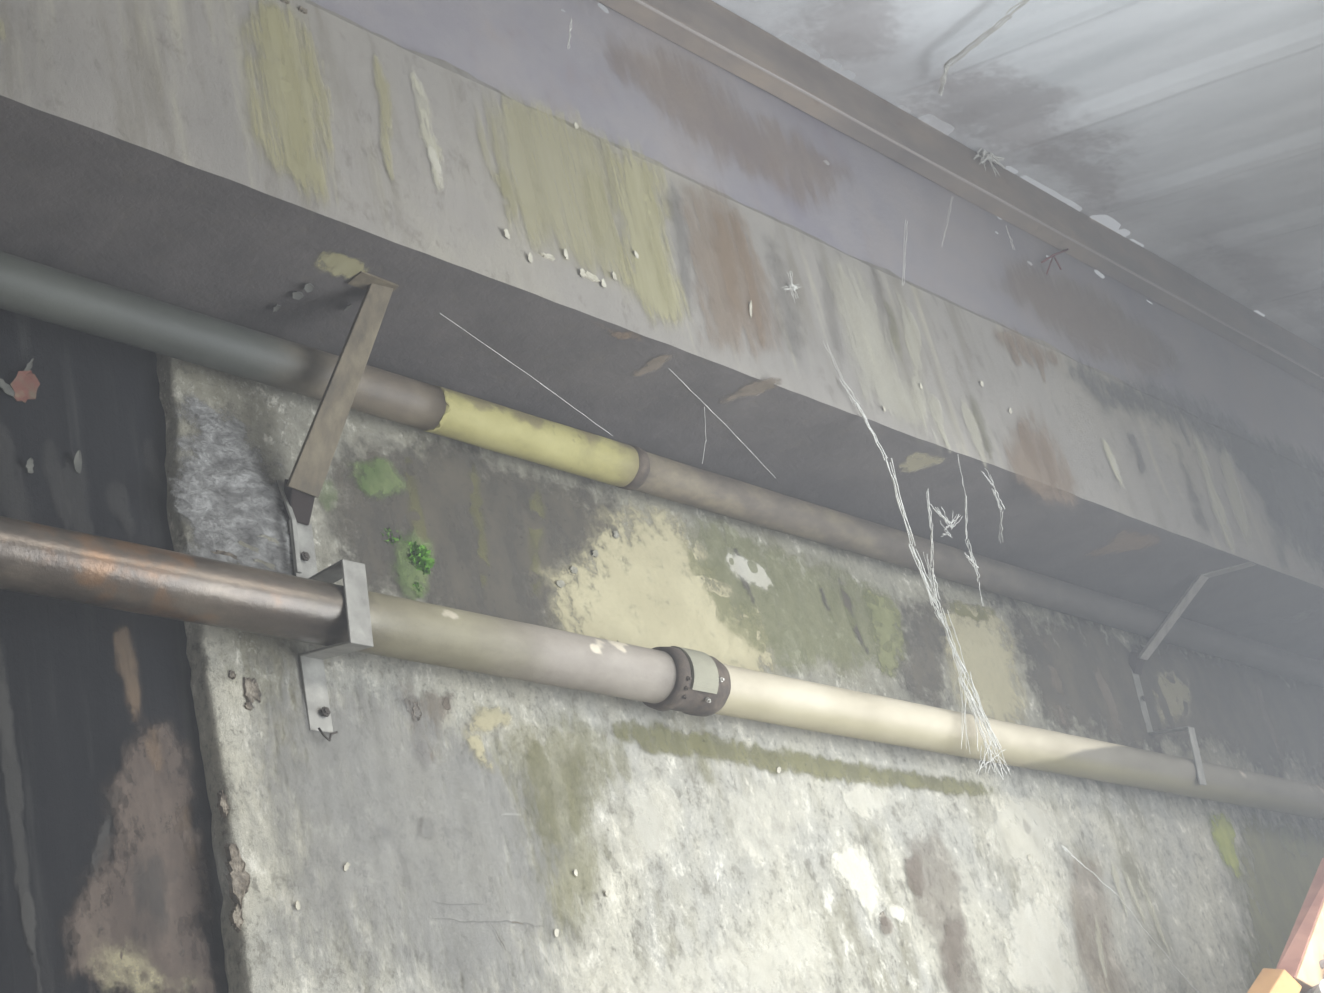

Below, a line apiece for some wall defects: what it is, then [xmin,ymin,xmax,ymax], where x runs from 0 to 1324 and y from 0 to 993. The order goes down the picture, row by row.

water stain [333,437,616,631]
water stain [900,592,950,708]
peeling [67,723,216,993]
spalling [224,843,250,933]